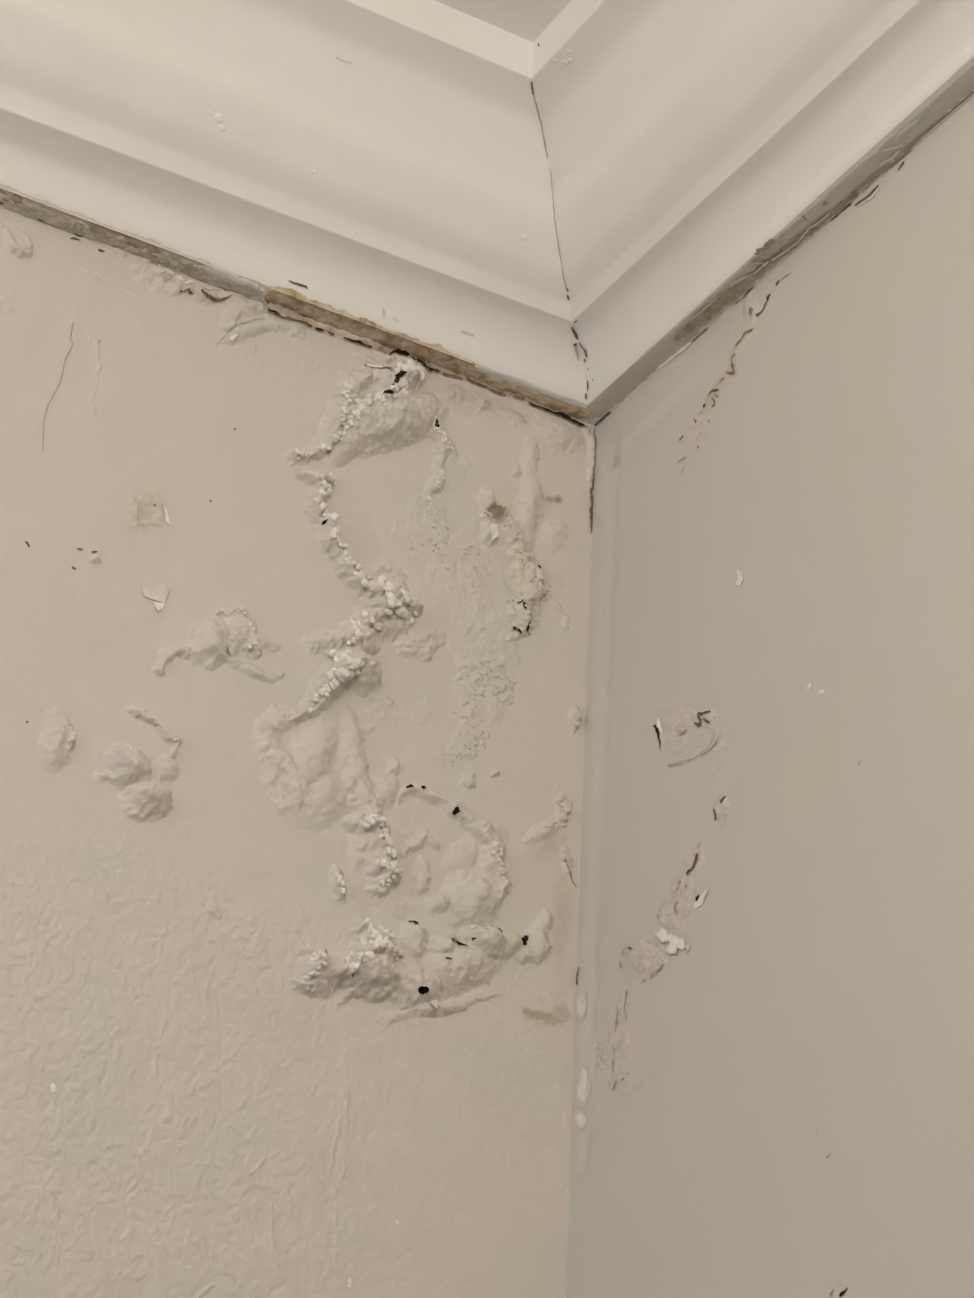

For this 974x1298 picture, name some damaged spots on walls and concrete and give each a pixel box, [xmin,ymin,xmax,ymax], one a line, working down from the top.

peeling [0,65,974,427]
crack [531,81,610,532]
peeling [619,842,709,982]
peeling [653,706,728,780]